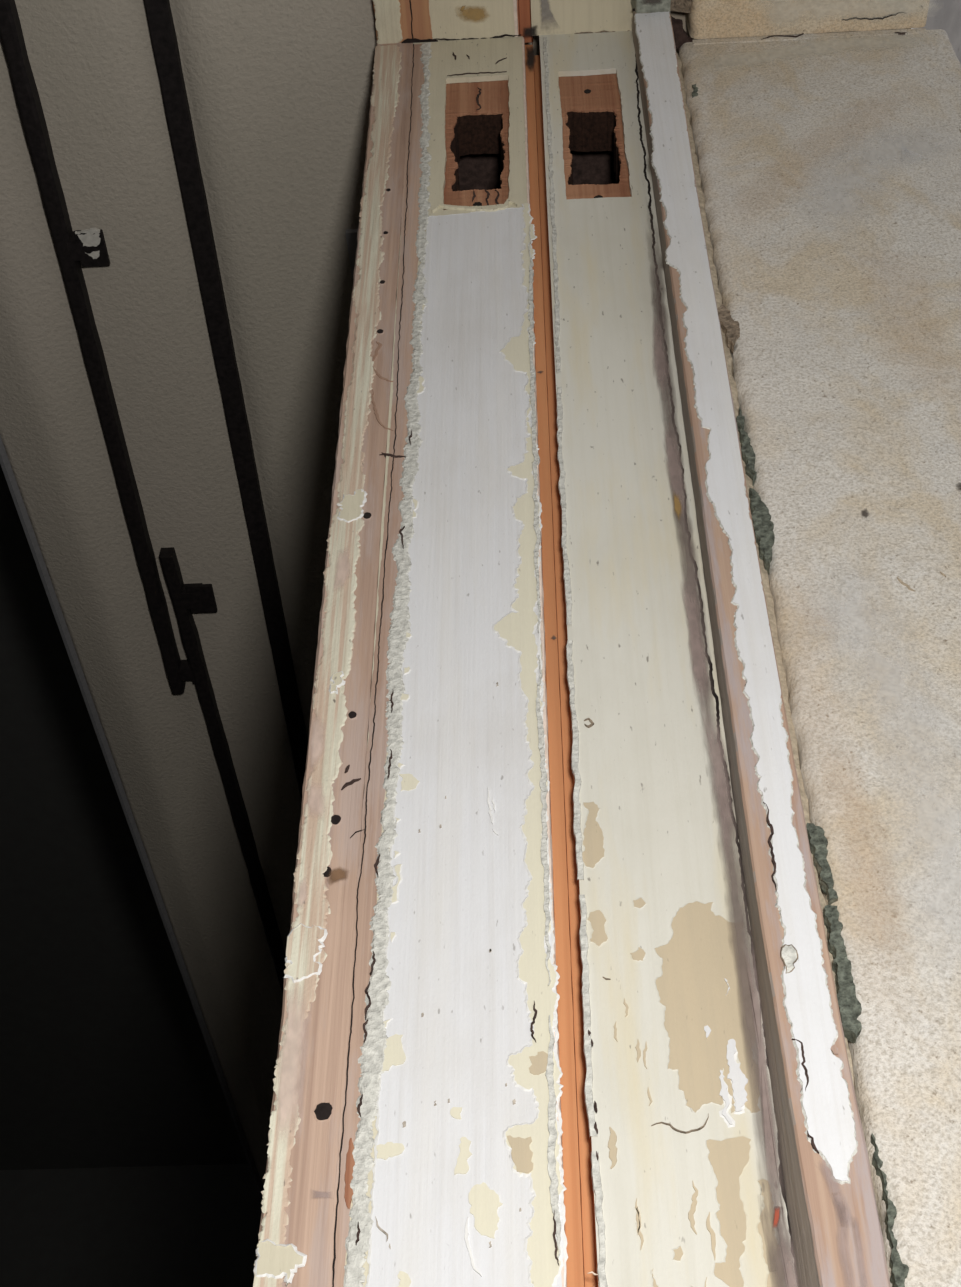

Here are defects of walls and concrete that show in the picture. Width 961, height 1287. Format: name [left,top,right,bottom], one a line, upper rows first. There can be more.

peeling [399,485,419,550]
peeling [253,0,412,1287]
peeling [630,12,865,1287]
peeling [425,199,568,1287]
peeling [388,749,420,824]
peeling [582,802,606,869]
peeling [586,910,609,948]
peeling [594,1101,617,1169]